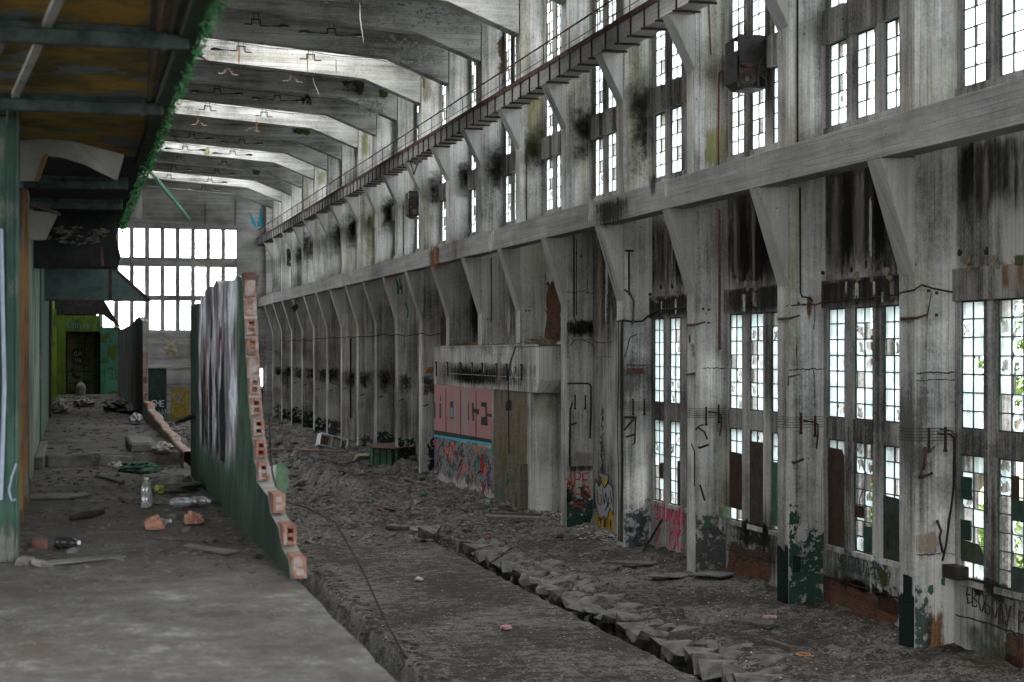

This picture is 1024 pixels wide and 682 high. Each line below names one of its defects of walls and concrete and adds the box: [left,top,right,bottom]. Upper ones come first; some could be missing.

flaking render [545,277,561,344]
peeling [696,504,945,649]